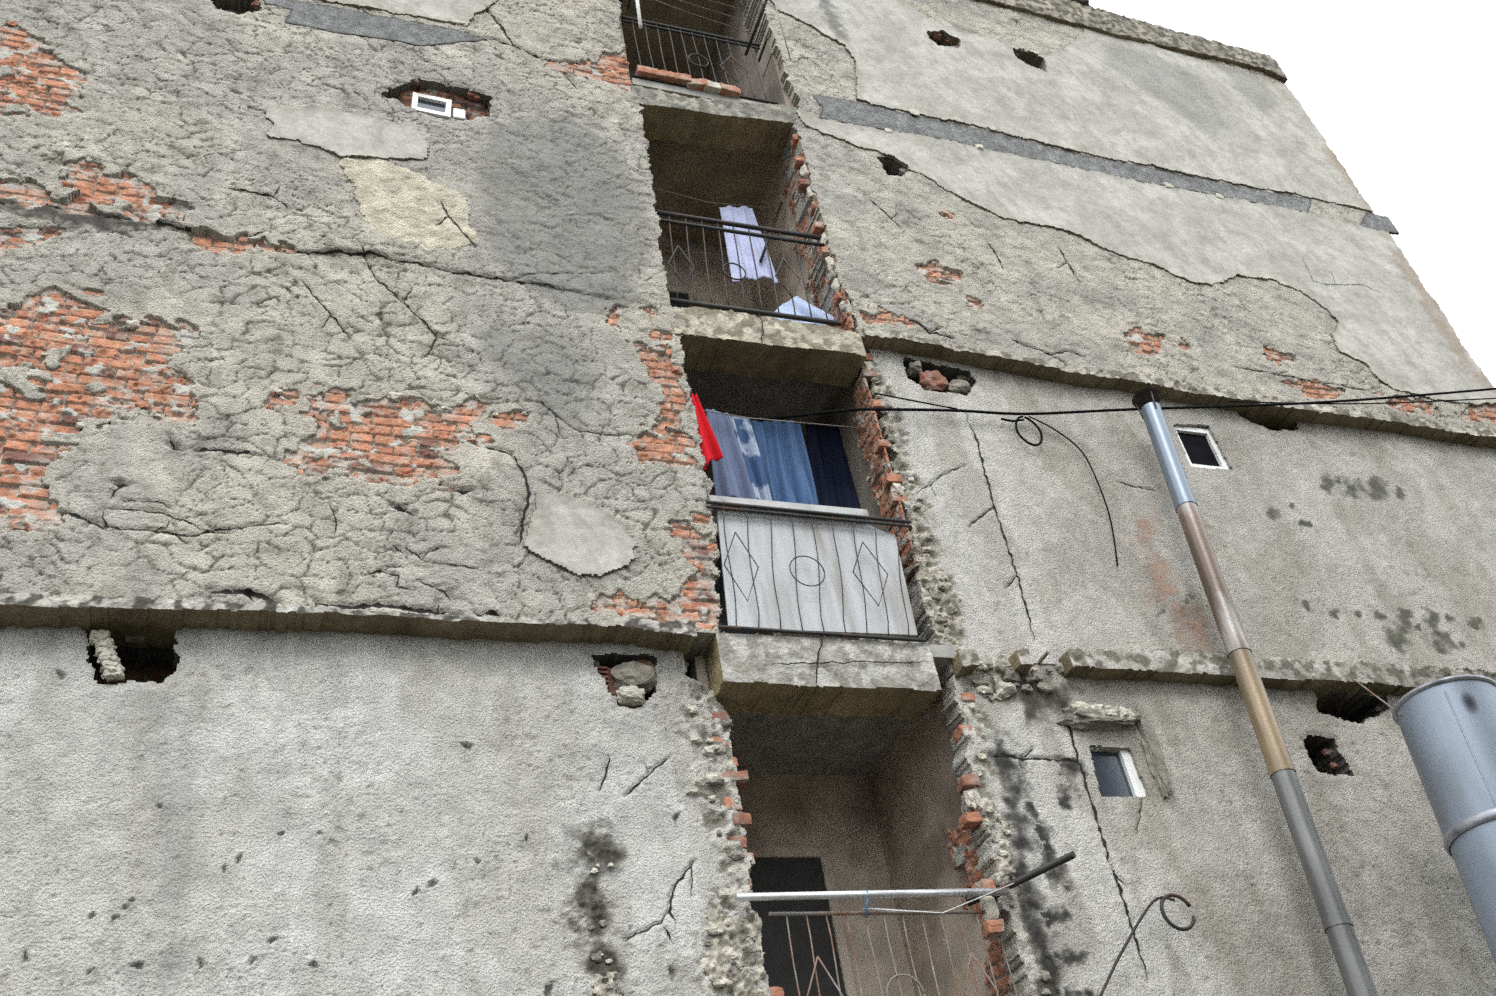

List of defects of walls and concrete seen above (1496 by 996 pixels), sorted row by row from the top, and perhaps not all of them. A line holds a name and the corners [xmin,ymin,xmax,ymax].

crack [229,186,615,357]
flaking render [770,0,1496,425]
flaking render [0,288,201,541]
spalling [88,629,173,685]
crack [66,483,289,544]
crack [208,588,275,603]
flaking render [264,377,540,494]
crack [315,506,499,617]
crack [486,447,531,545]
flaking render [523,490,723,631]
crack [918,418,1035,640]
flaking render [945,653,1064,996]